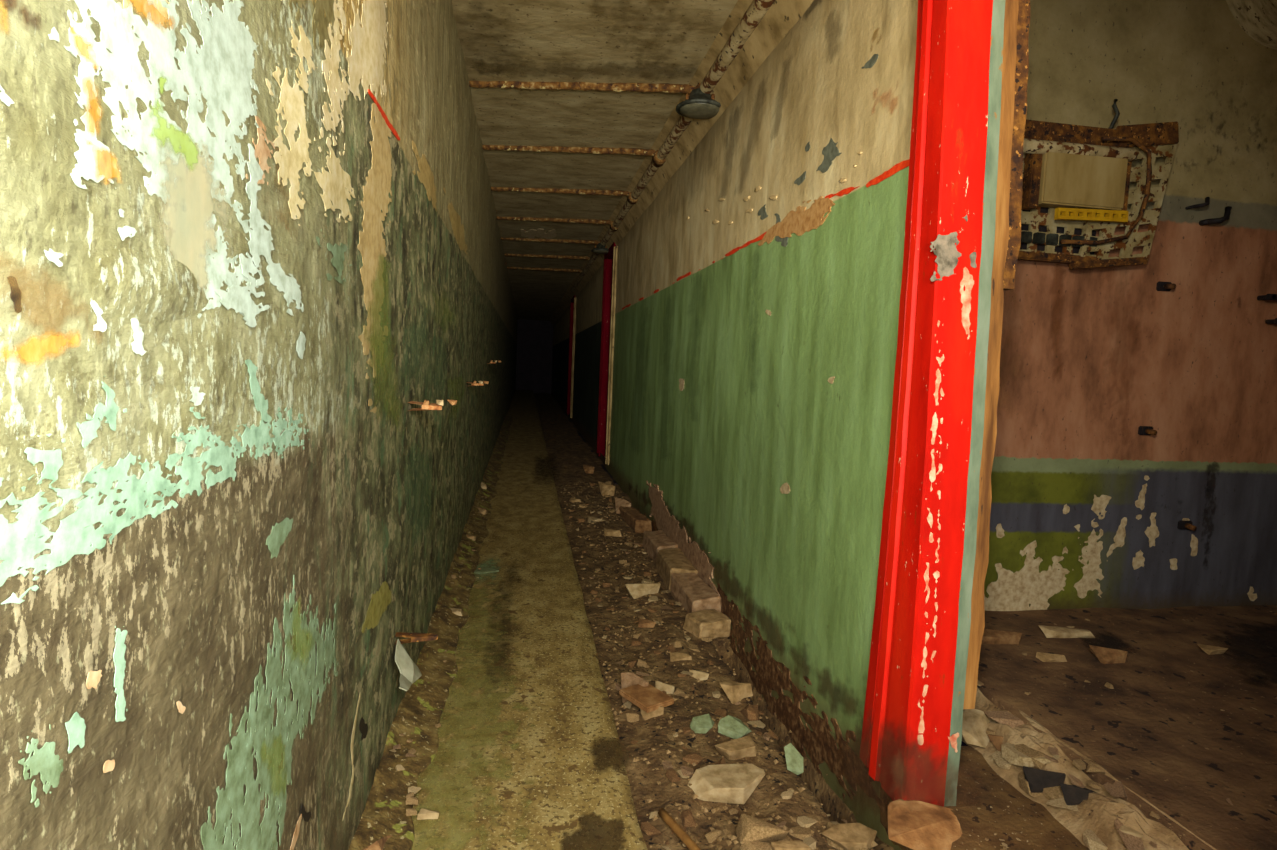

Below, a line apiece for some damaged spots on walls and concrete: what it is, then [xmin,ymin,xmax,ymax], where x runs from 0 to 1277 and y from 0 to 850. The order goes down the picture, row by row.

rust [5,0,37,26]
peeling [44,249,64,267]
peeling [48,0,393,413]
peeling [757,196,835,247]
peeling [794,138,841,185]
peeling [0,359,314,604]
peeling [917,320,945,745]
peeling [984,475,1159,611]
peeling [18,712,86,807]
peeling [86,626,127,722]
peeling [103,759,115,773]
peeling [201,575,338,850]